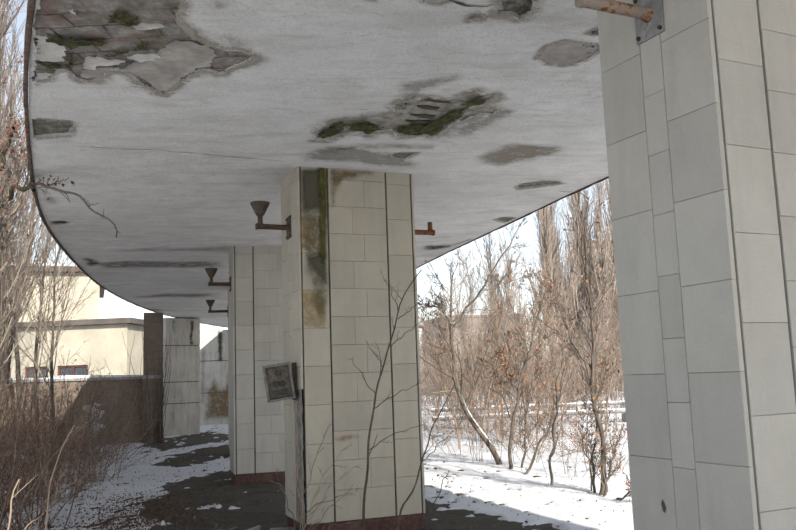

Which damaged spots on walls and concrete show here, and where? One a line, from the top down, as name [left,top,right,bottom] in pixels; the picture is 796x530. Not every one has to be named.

crack [449,0,494,8]
spalling [32,0,262,97]
peeling [534,28,600,67]
spalling [309,88,508,153]
water stain [485,145,558,165]